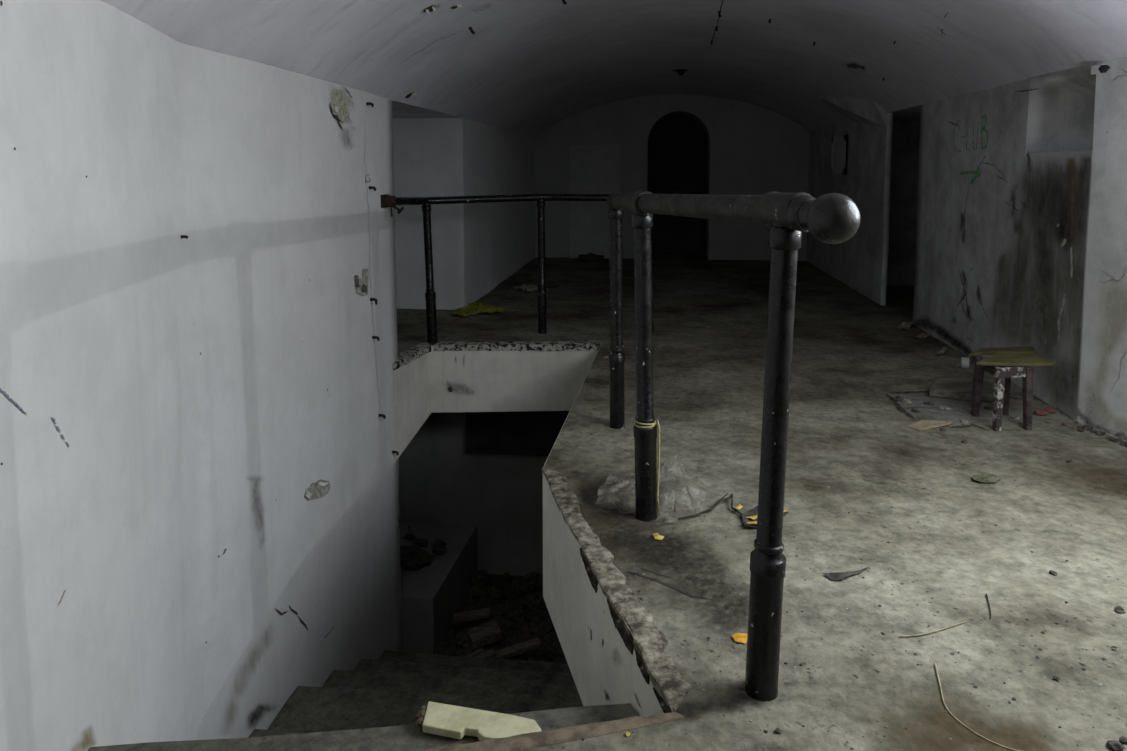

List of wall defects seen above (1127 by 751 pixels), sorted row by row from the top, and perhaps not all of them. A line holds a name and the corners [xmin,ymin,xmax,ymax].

spalling [330,87,353,143]
water stain [995,159,1127,439]
spalling [304,479,330,500]
spalling [579,547,674,713]